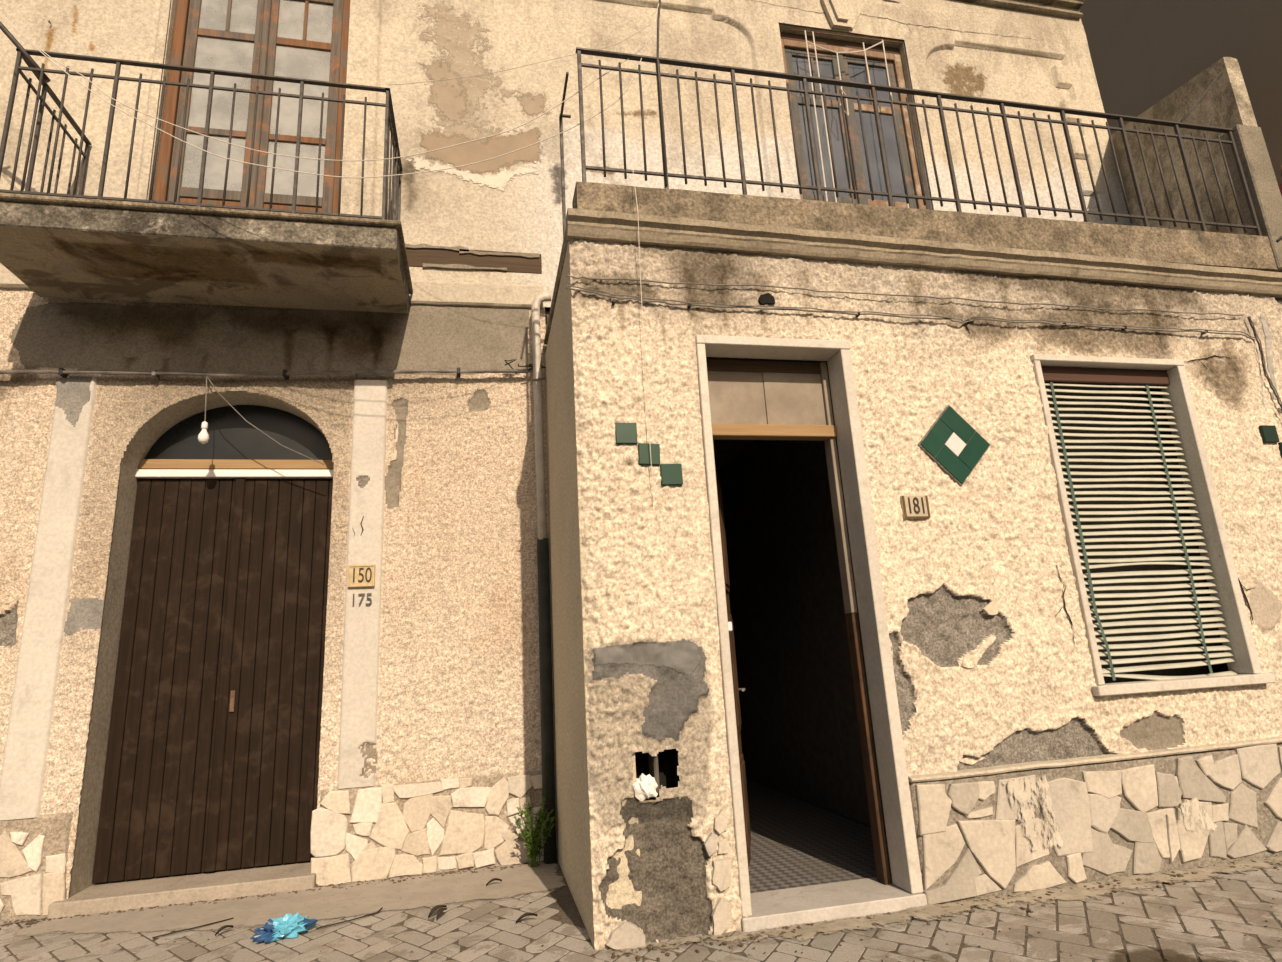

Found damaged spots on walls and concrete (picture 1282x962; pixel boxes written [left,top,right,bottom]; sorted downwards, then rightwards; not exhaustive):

peeling [406,2,549,191]
spalling [356,397,408,509]
spalling [0,600,19,648]
spalling [889,583,1015,735]
spalling [957,717,1117,770]
spalling [1120,710,1186,751]
spalling [598,749,732,950]